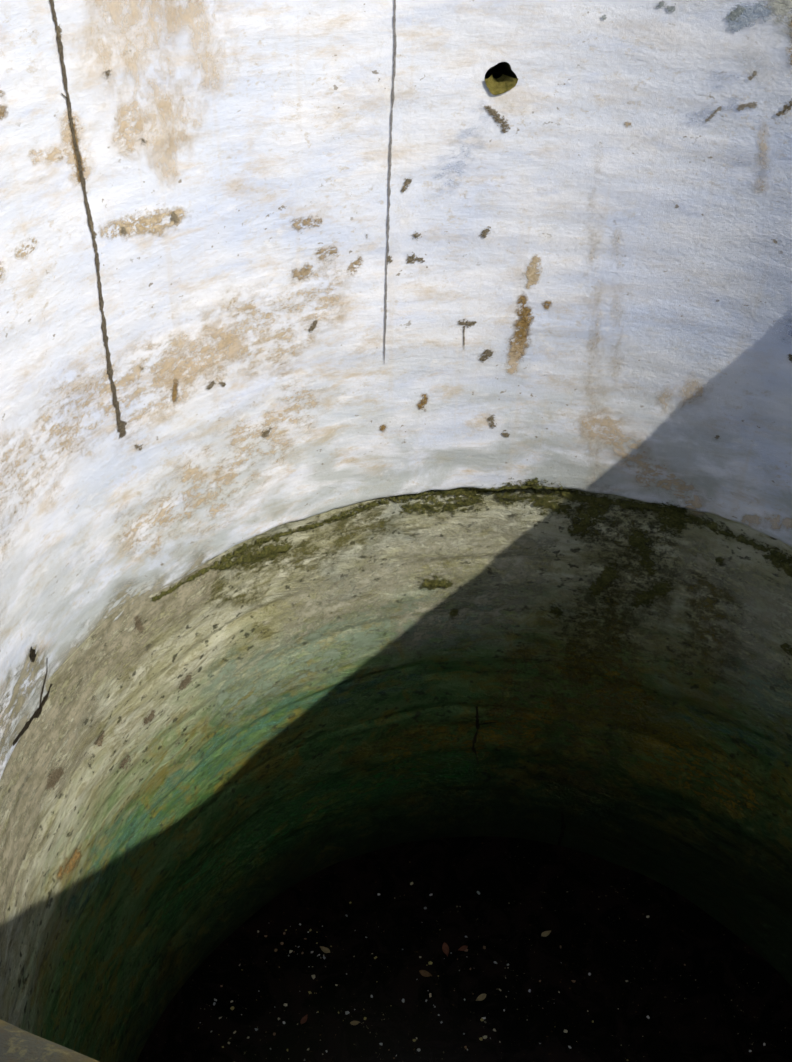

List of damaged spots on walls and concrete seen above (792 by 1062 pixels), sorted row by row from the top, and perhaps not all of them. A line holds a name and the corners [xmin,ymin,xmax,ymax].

crack [49,0,127,438]
crack [384,0,397,364]
leakage [285,519,548,648]
leakage [679,546,792,682]